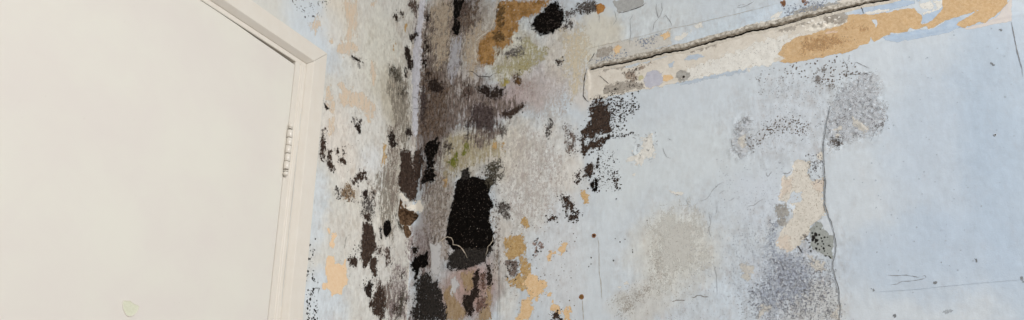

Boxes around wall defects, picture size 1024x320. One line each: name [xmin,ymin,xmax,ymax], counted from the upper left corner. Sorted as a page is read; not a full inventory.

crack [578,0,901,101]
spalling [585,0,1012,101]
water stain [306,238,318,320]
peeling [322,228,348,297]
water stain [319,0,640,320]
peeling [546,242,568,261]
peeling [545,292,572,320]
water stain [607,56,879,320]
peeling [775,151,834,259]
crack [822,109,841,320]